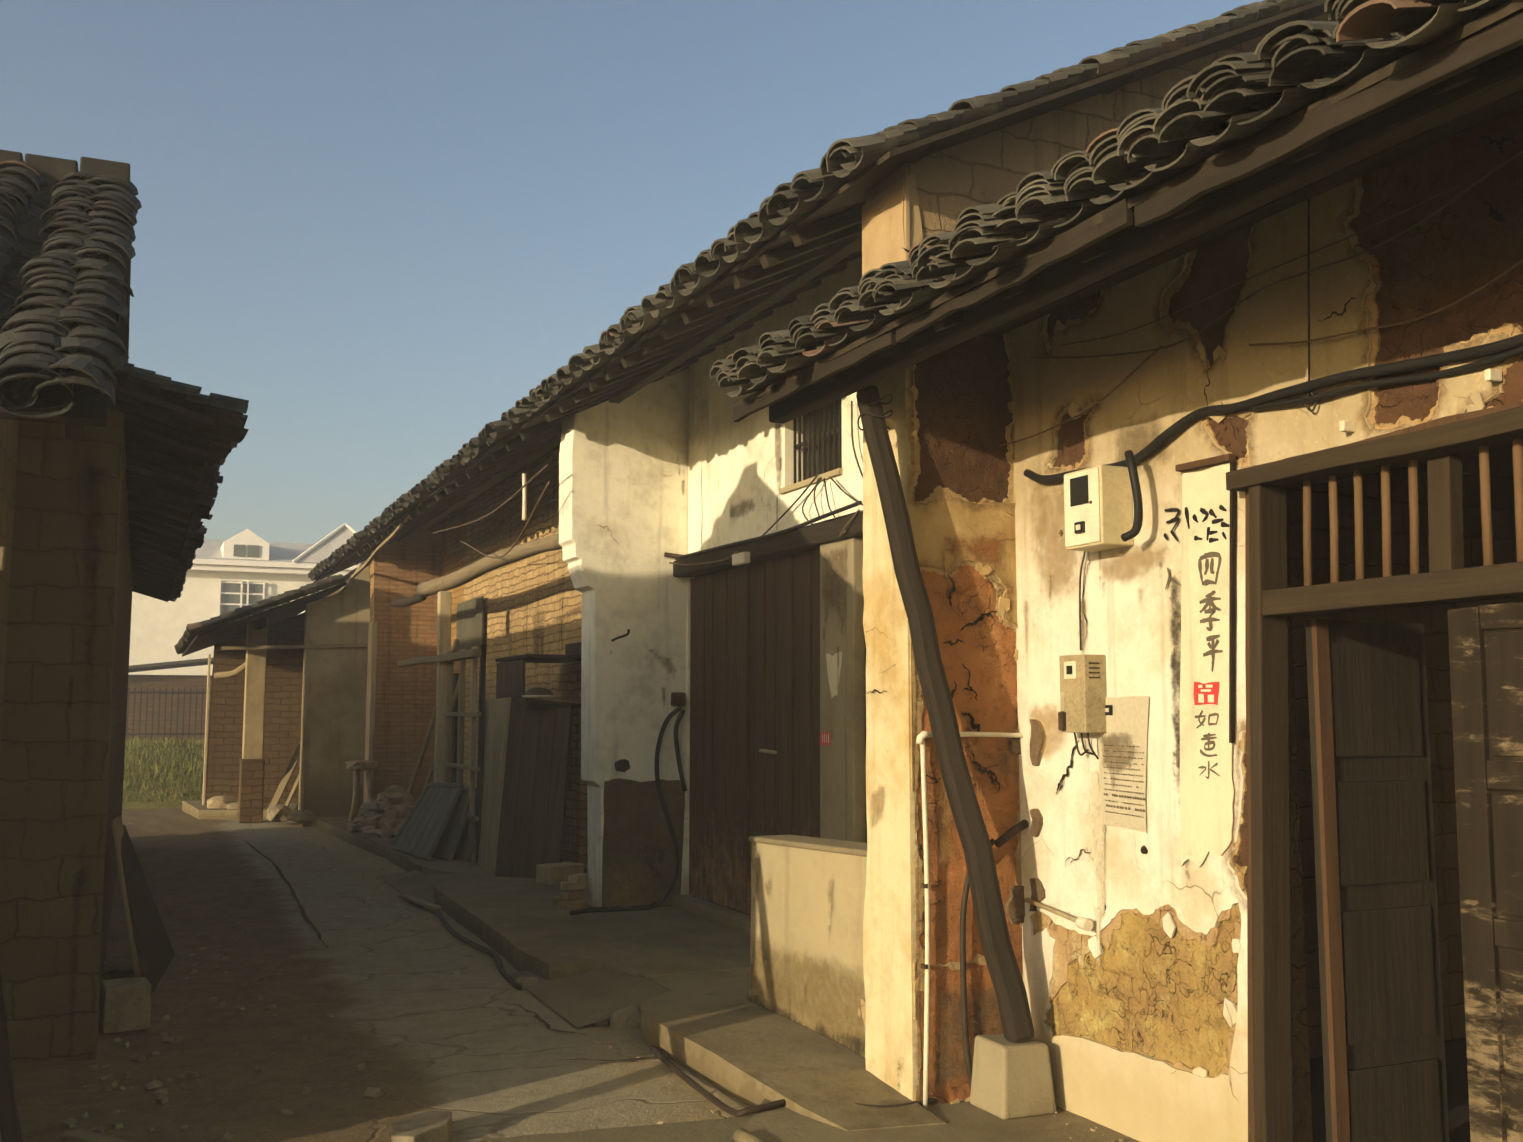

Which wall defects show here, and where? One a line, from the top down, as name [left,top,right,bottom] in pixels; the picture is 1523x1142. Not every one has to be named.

spalling [1347,177,1440,429]
spalling [1444,323,1522,353]
peeling [1466,354,1523,412]
crack [926,574,1000,791]
spalling [913,669,970,1107]
peeling [1162,912,1176,939]
peeling [1088,936,1103,958]
peeling [1232,939,1242,953]
peeling [1223,997,1237,1028]
peeling [1193,1067,1208,1077]